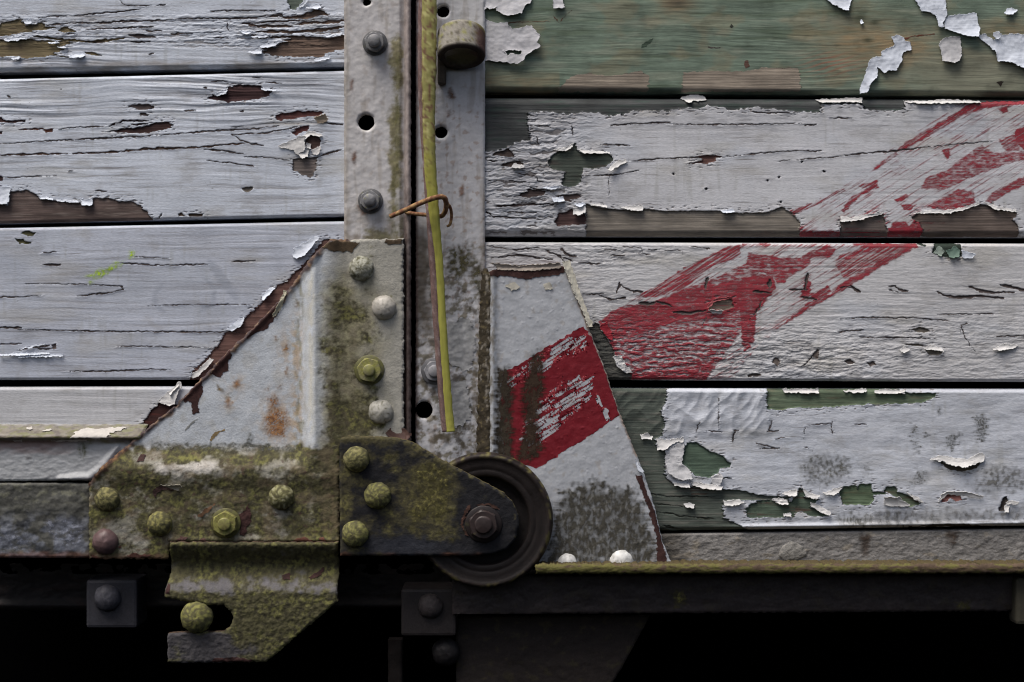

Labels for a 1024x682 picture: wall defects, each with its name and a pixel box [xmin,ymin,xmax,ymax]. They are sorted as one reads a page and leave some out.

peeling [240,0,344,62]
peeling [915,0,1024,68]
peeling [485,35,1024,169]
peeling [486,143,801,237]
crack [0,251,204,298]
crack [0,326,245,372]
crack [160,301,254,309]
peeling [142,236,335,428]
crack [749,273,817,320]
crack [839,284,1024,352]
corrosion [266,398,287,437]
peeling [589,321,936,530]